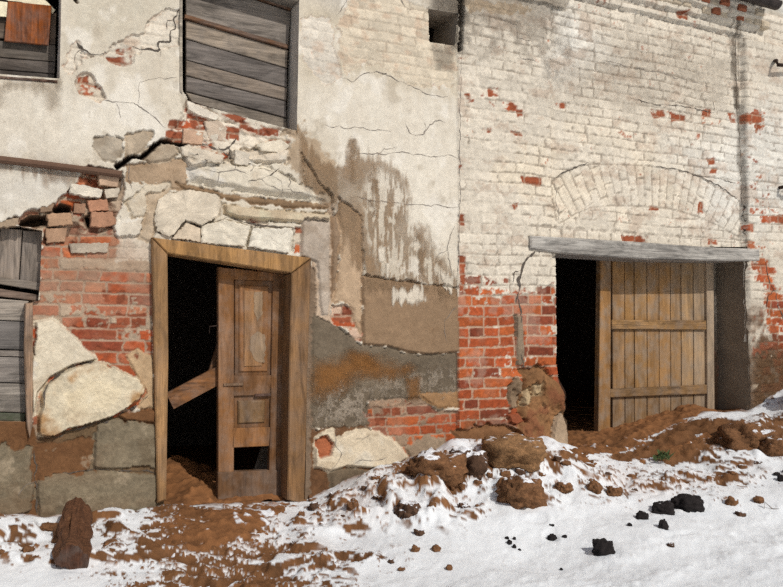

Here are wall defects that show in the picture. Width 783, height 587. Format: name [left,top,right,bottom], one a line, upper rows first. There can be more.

crack [74,41,104,61]
peeling [63,8,179,103]
crack [132,8,180,54]
peeling [300,0,459,90]
crack [105,77,310,201]
damp [297,127,460,306]
crack [329,0,466,342]
spalling [0,101,298,443]
crack [513,251,536,323]
spalling [759,267,783,354]
peeling [310,273,519,473]